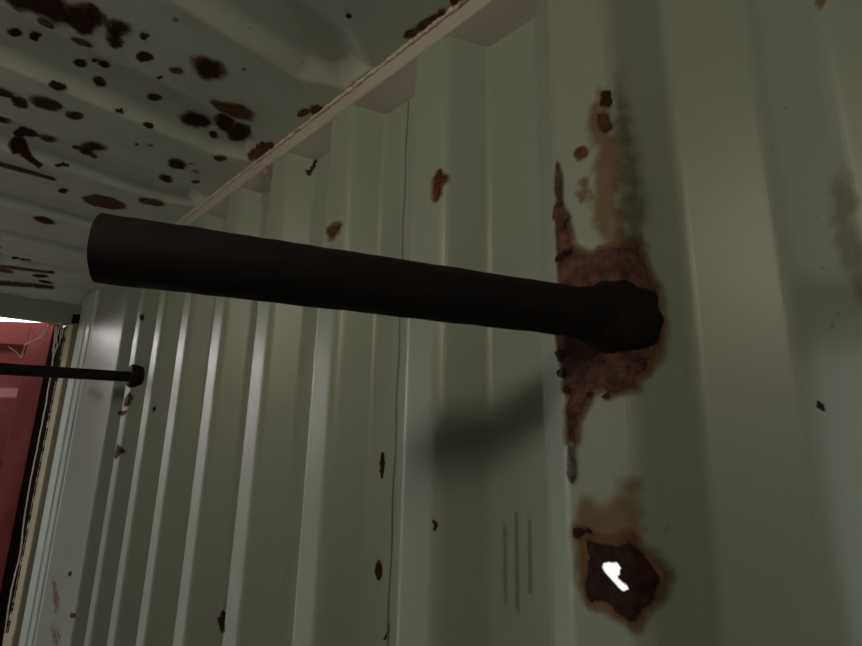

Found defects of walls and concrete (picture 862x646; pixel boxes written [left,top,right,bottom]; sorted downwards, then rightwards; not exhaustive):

corrosion [403,0,461,39]
corrosion [297,105,323,117]
corrosion [552,90,667,484]
corrosion [574,498,671,633]